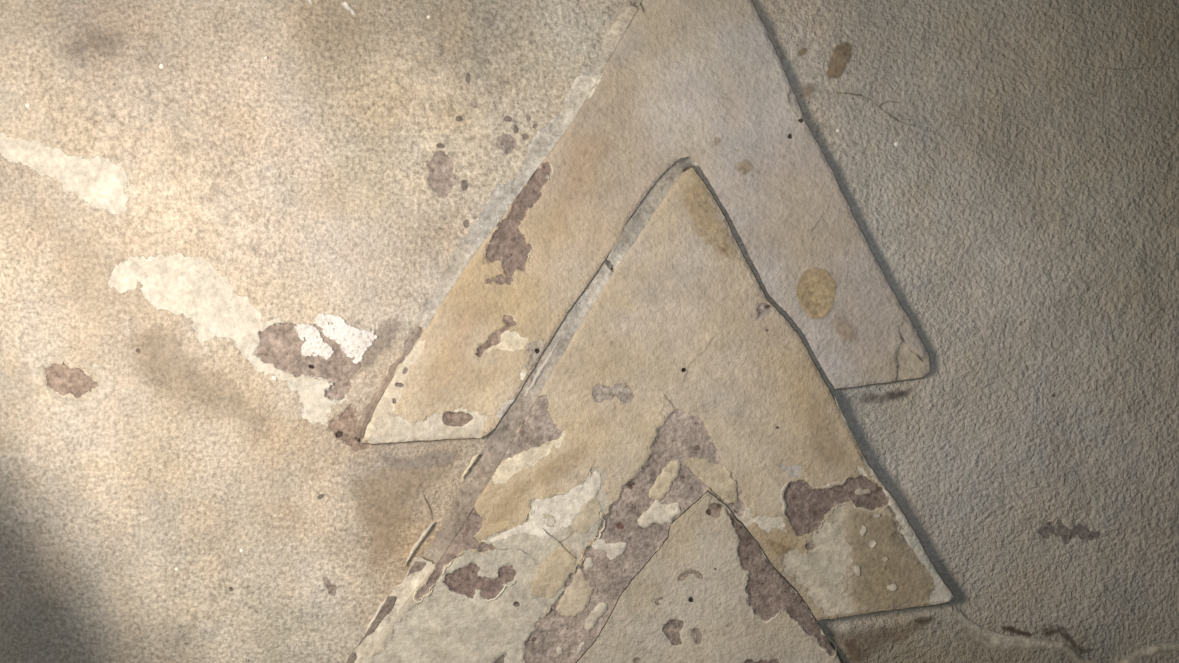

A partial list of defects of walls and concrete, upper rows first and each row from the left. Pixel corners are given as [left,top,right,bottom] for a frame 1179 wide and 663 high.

spalling [426,143,468,199]
spalling [486,162,554,285]
spalling [40,358,98,401]
peeling [108,252,514,452]
spalling [492,395,566,485]
peeling [373,409,1100,663]